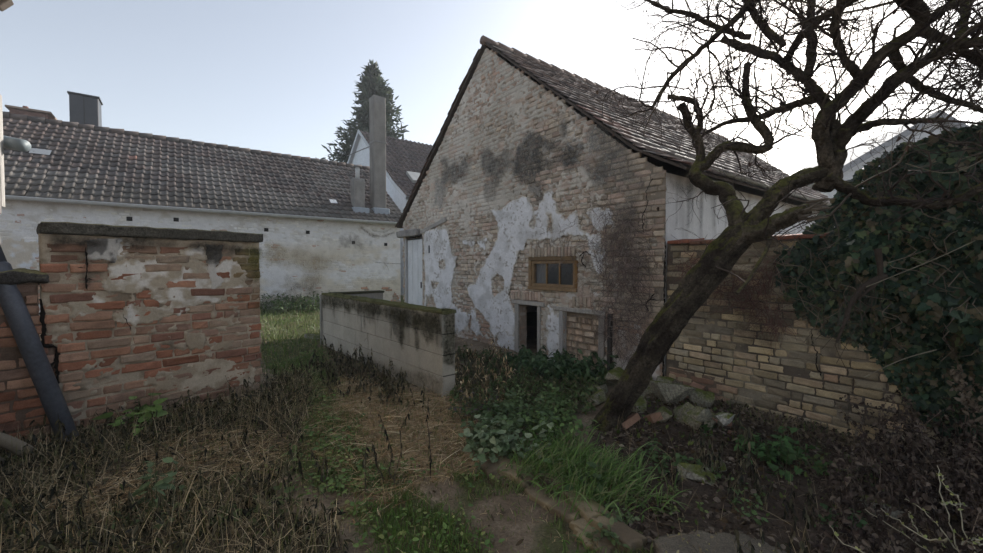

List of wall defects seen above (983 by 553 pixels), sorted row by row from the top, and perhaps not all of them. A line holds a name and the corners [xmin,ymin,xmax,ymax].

leakage [482,128,642,223]
crack [78,247,93,290]
peeling [66,238,249,328]
peeling [423,190,616,362]
crack [39,299,61,384]
peeling [137,331,256,401]
peeling [605,324,641,370]